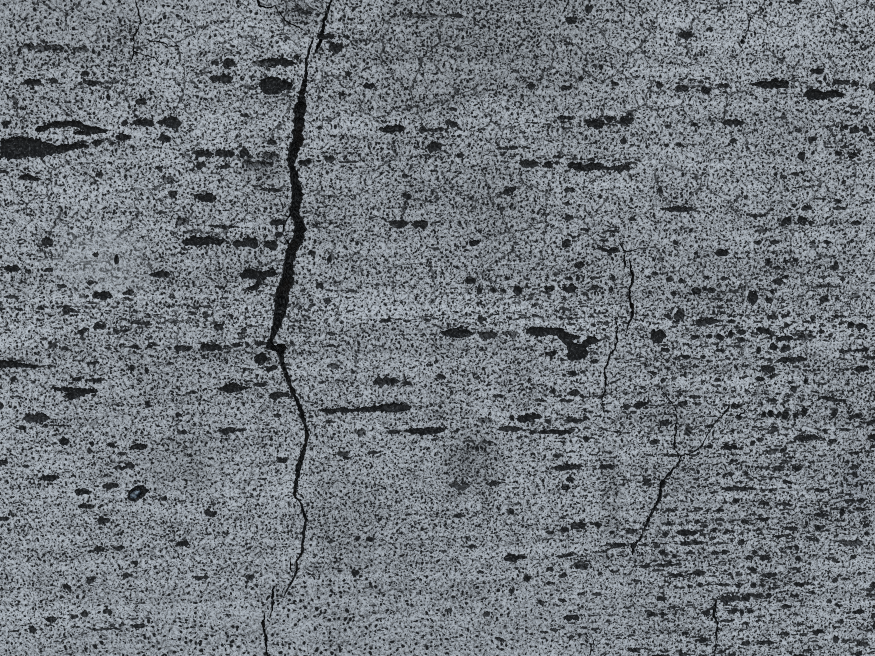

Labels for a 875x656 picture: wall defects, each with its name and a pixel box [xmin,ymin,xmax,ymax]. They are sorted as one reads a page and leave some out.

crack [256,0,332,656]
crack [601,235,639,415]
crack [630,390,750,554]
crack [712,594,720,656]